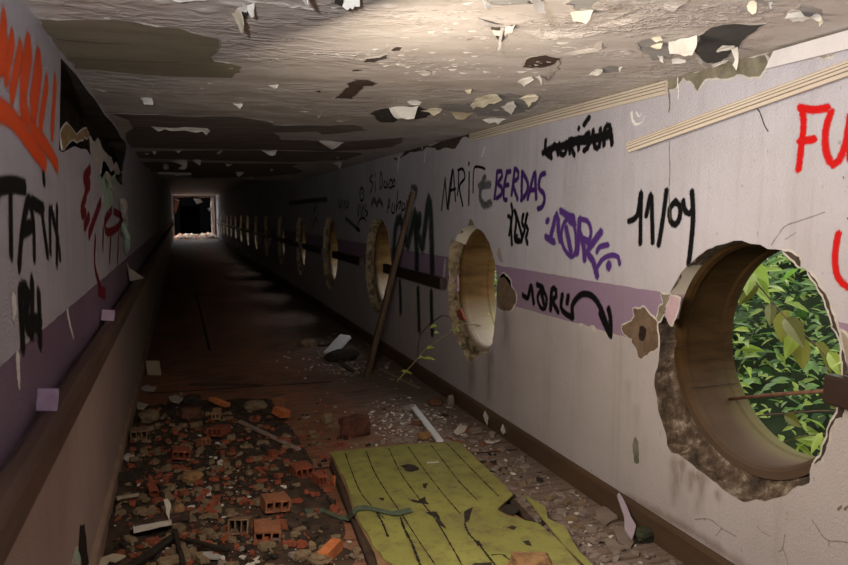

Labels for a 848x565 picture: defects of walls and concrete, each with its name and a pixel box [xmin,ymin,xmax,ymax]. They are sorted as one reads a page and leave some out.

peeling [785,4,824,27]
peeling [36,0,774,254]
flaking render [366,218,383,313]
flaking render [443,217,488,361]
flaking render [691,241,744,265]
flaking render [776,249,848,377]
flaking render [579,274,846,502]